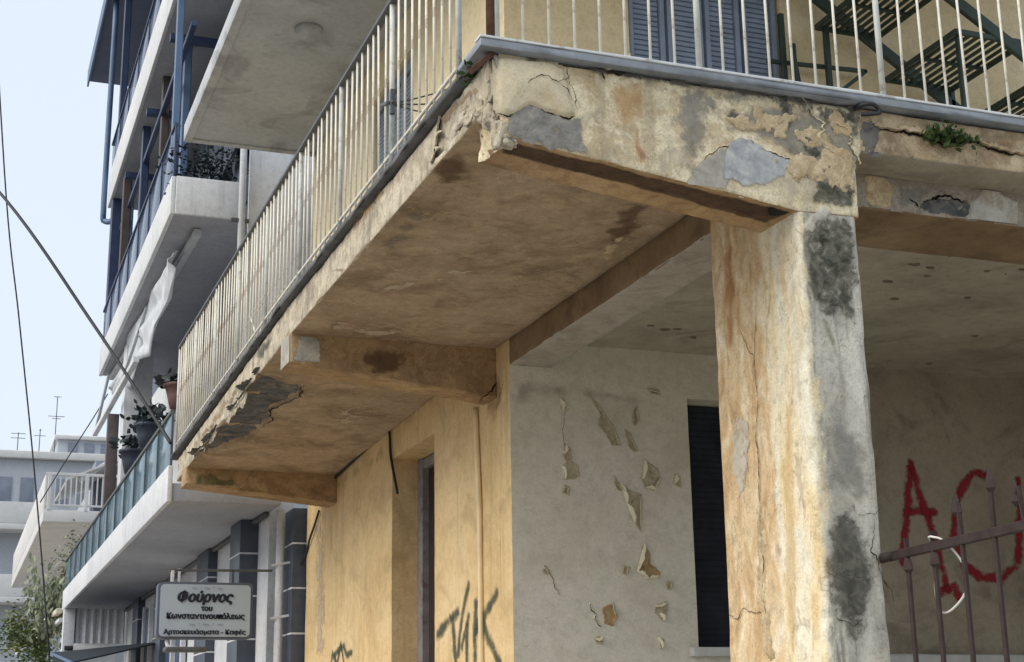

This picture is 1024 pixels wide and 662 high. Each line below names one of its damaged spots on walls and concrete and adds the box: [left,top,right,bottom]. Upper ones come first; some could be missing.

spalling [441,55,587,153]
peeling [688,104,893,208]
crack [802,97,1024,178]
peeling [910,190,1019,224]
mould [806,181,860,344]
spalling [187,333,320,455]
damp [365,352,402,373]
peeling [562,444,580,496]
peeling [590,395,681,622]
damp [826,427,872,640]
peeling [594,602,618,645]